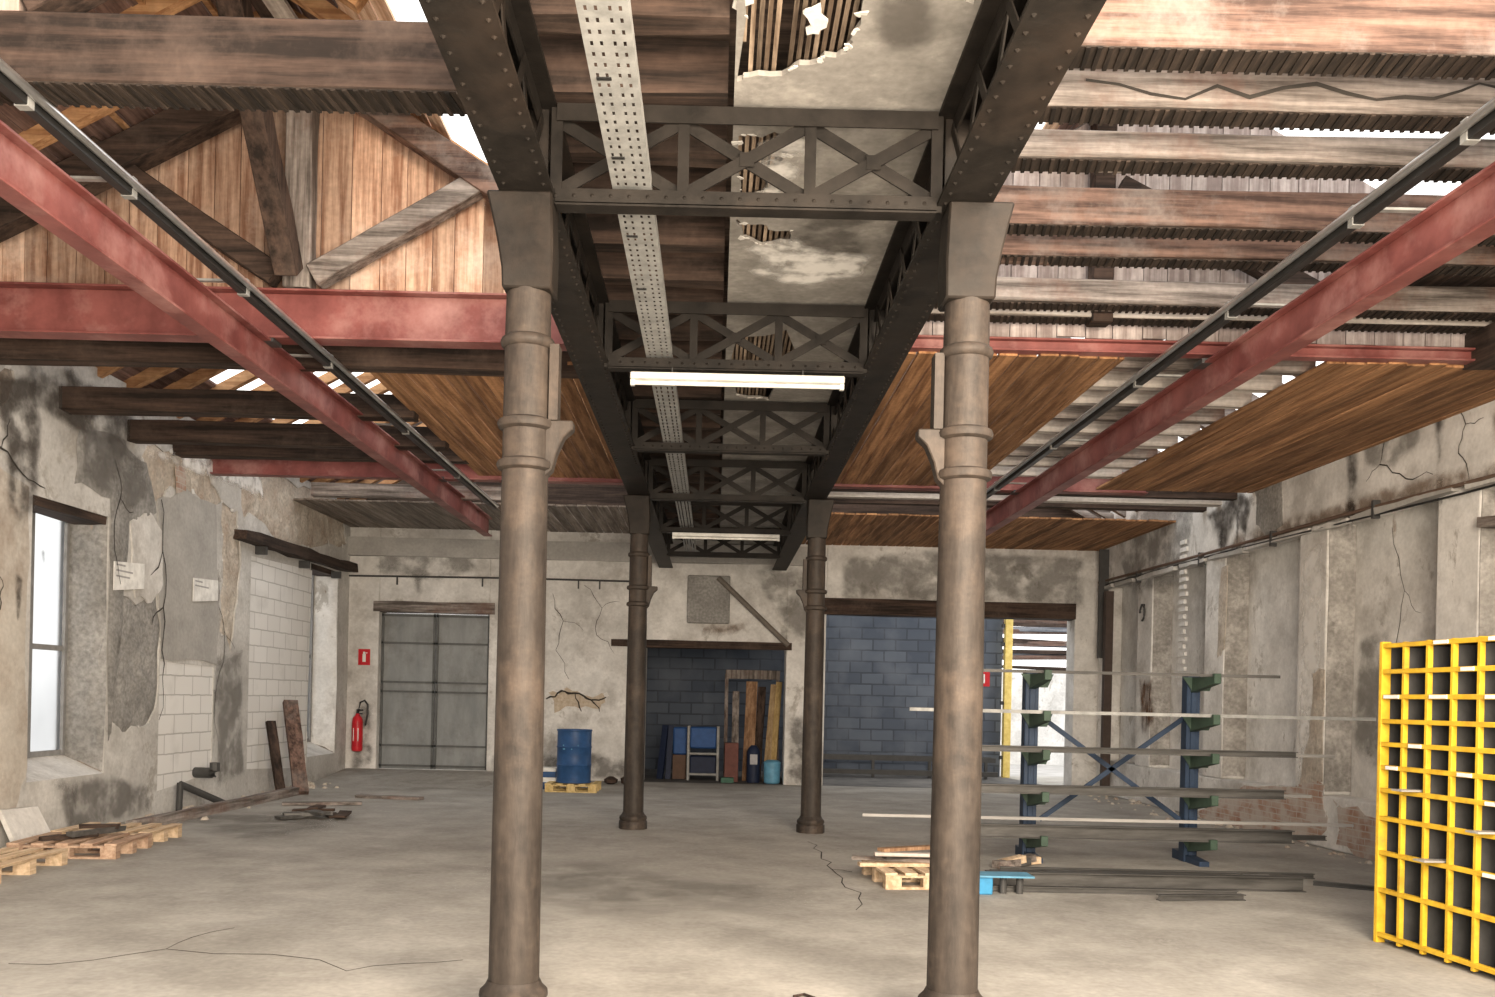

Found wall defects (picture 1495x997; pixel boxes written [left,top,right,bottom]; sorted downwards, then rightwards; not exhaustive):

flaking render [732,0,869,72]
water stain [881,0,926,45]
crack [1086,78,1495,101]
water stain [752,219,867,284]
crack [0,420,44,488]
spalling [141,445,346,648]
spalling [112,596,161,732]
crack [809,842,862,910]